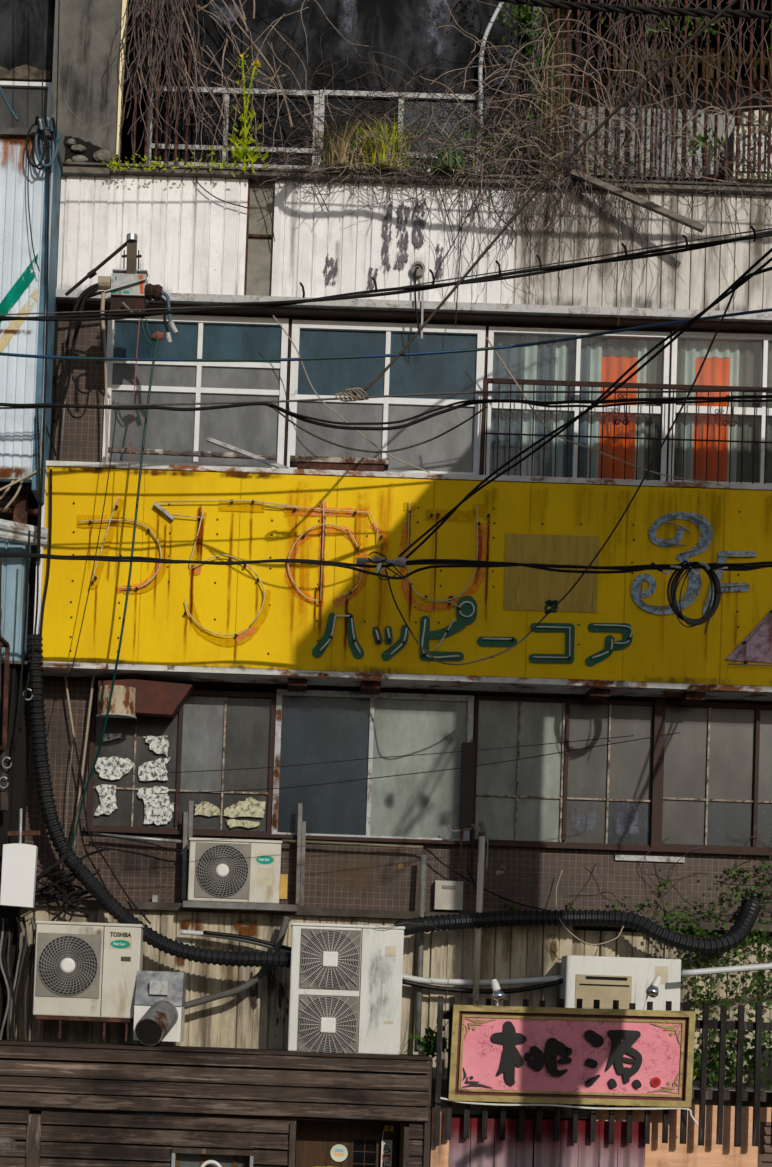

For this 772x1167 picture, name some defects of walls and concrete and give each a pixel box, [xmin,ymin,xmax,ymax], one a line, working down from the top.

rust [1,137,33,170]
damp [523,190,583,264]
damp [599,192,639,273]
rust [148,512,172,591]
rust [185,506,203,631]
rust [291,522,325,632]